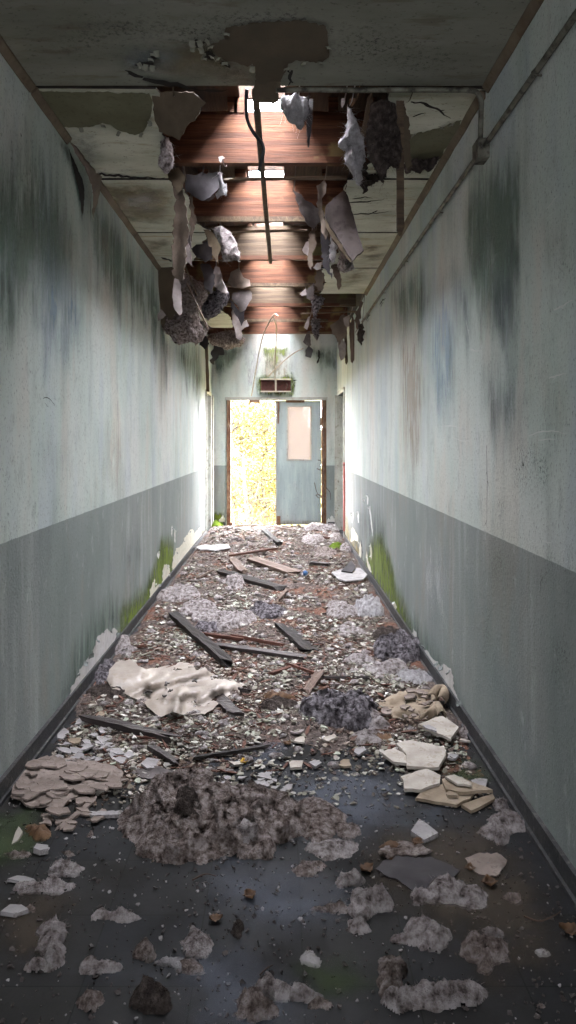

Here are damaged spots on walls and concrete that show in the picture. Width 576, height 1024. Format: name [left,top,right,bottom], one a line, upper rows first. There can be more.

peeling [189,38,230,68]
crack [411,101,451,119]
water stain [468,166,519,310]
water stain [96,207,164,345]
peeling [149,527,202,597]
peeling [70,628,119,694]
peeling [412,629,461,707]